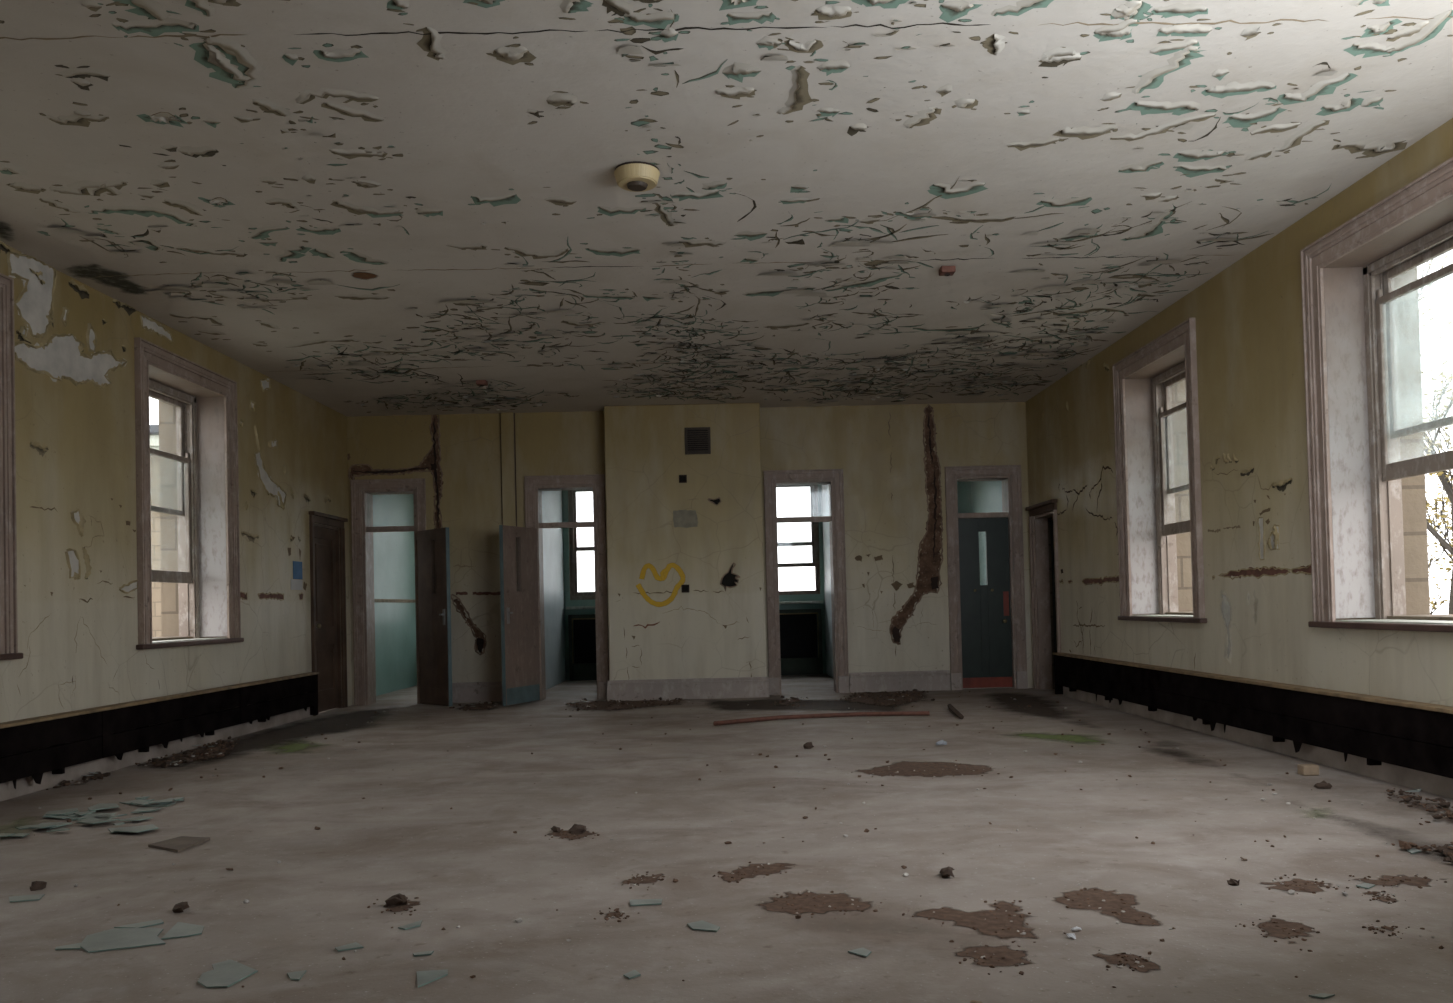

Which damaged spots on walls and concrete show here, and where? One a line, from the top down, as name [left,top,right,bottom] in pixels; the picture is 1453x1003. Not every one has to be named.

flaking render [451,594,487,655]
peeling [0,0,1453,645]